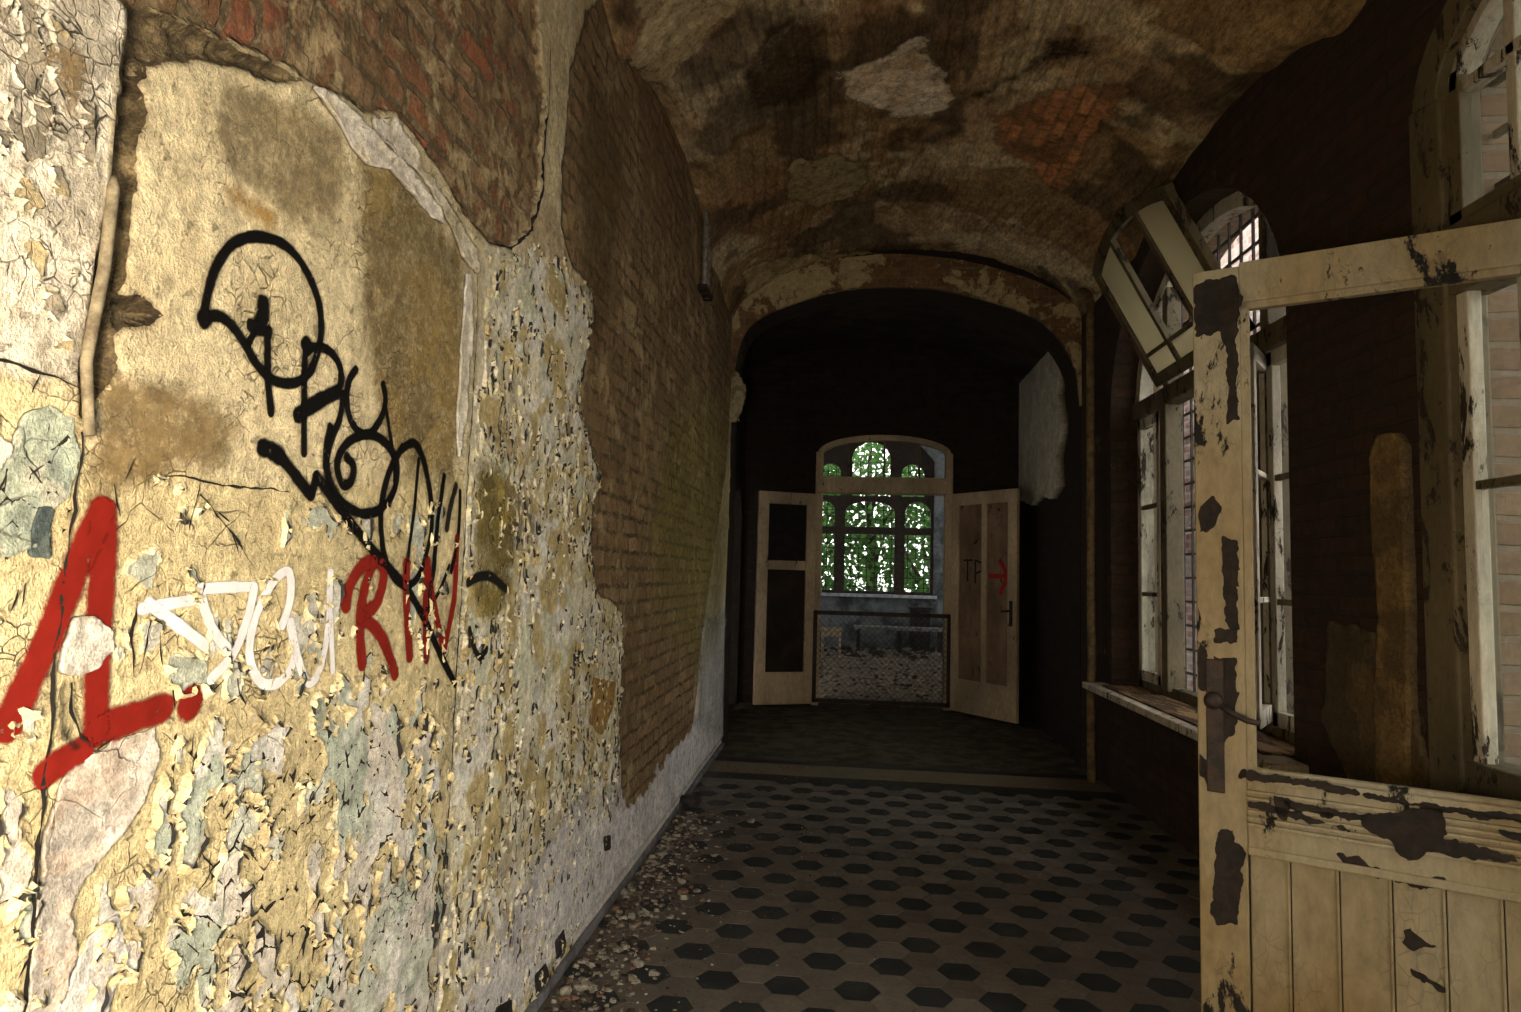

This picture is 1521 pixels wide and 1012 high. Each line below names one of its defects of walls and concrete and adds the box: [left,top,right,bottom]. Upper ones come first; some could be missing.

peeling [837,36,956,118]
crack [0,358,78,392]
crack [0,424,115,1012]
flaking render [0,0,747,1012]